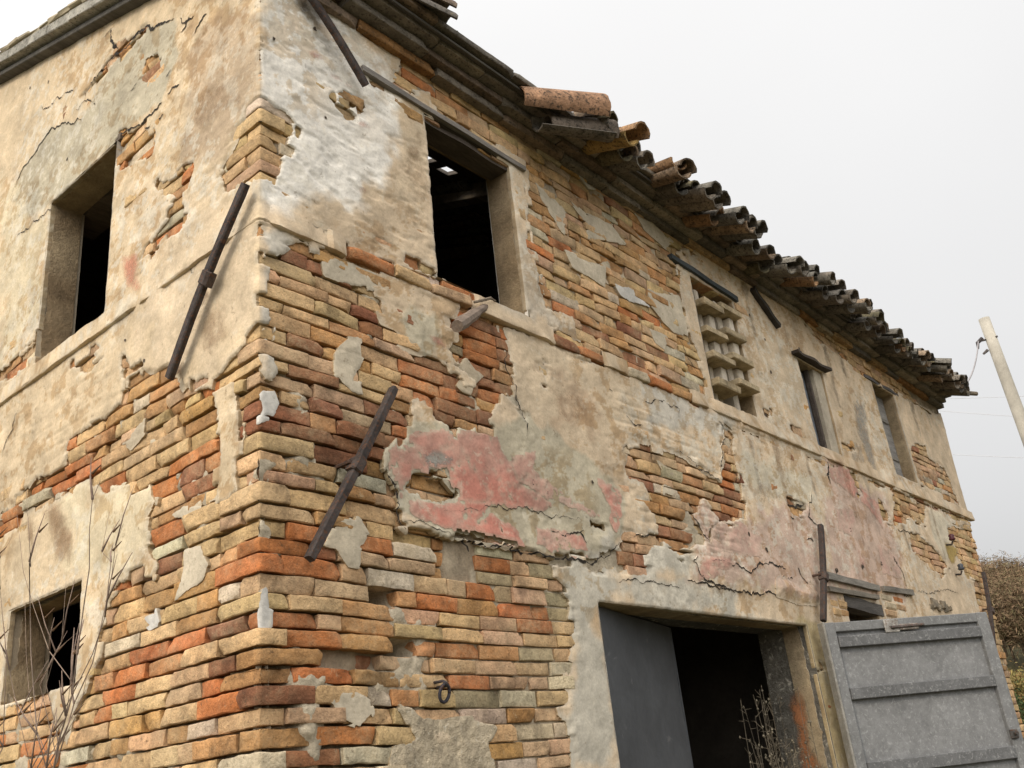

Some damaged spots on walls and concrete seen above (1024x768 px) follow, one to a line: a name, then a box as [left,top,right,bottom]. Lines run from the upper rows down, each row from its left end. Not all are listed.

crack [14,14,205,187]
spalling [117,118,159,171]
spalling [222,98,300,196]
spalling [316,82,364,121]
spalling [124,163,194,259]
spalling [369,63,722,408]
spalling [0,243,768,768]
crack [388,475,655,566]
crack [619,515,808,596]
spalling [850,444,1024,738]